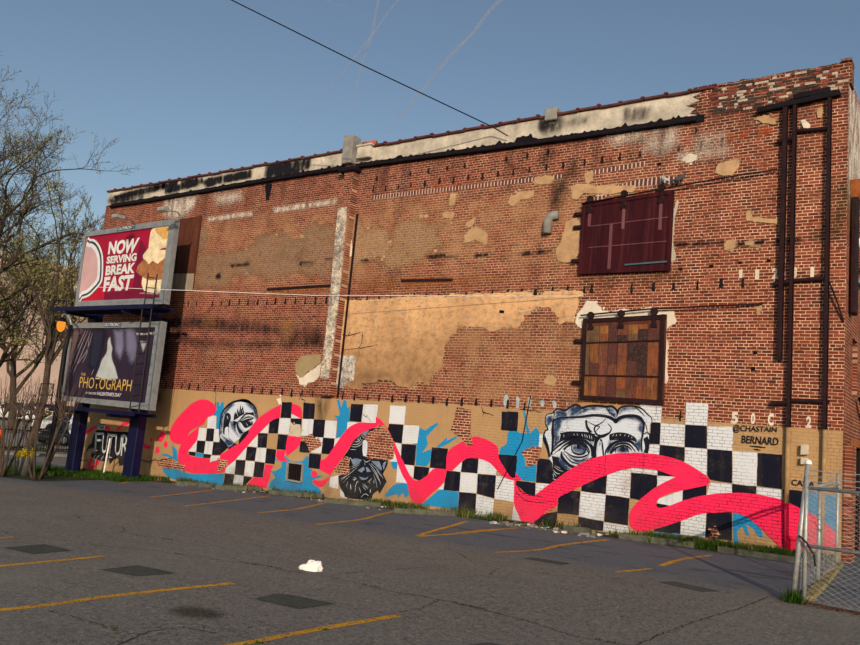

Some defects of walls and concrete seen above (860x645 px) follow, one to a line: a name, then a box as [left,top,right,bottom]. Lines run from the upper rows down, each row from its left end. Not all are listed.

leakage [265,158,310,177]
leakage [108,169,251,217]
leakage [275,199,335,212]
flaking render [296,364,321,387]
peeling [336,355,356,389]
peeling [365,425,394,460]
peeling [451,407,473,446]